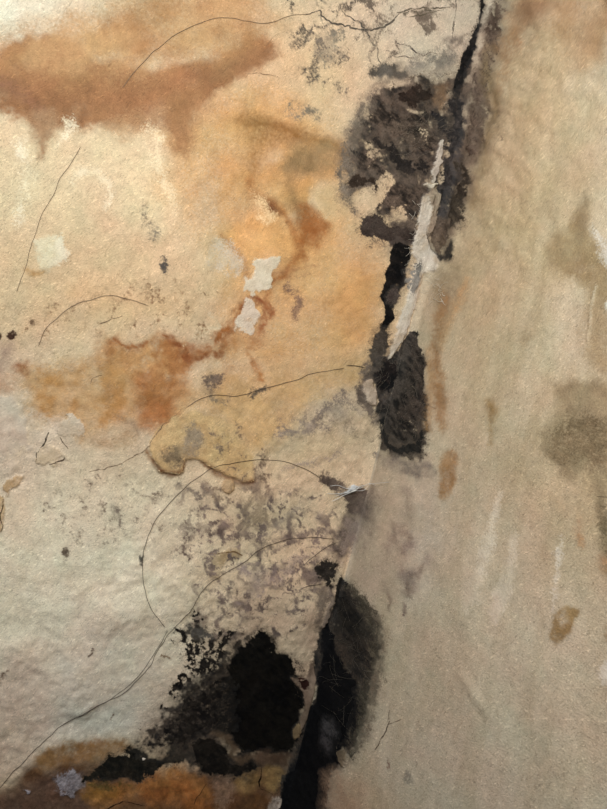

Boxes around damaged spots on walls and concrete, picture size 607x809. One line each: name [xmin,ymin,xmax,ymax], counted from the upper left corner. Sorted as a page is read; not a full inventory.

rust [0,0,297,165]
leakage [4,107,121,236]
rust [0,198,334,438]
flaking render [197,228,283,337]
peeling [33,411,87,468]
leakage [25,0,507,809]
leakage [534,187,607,619]
peeling [0,472,26,534]
rust [28,733,128,776]
rust [78,771,274,809]
rust [315,762,360,809]
crack [374,710,401,750]